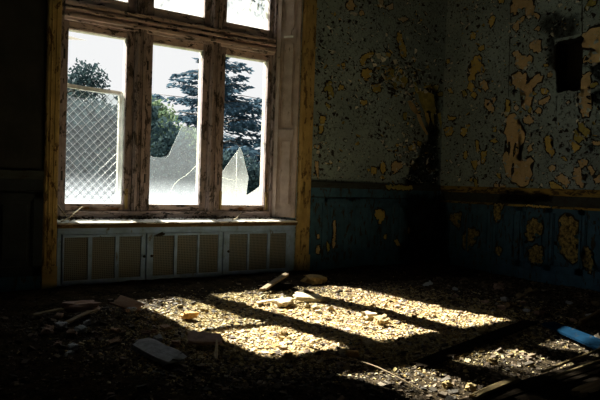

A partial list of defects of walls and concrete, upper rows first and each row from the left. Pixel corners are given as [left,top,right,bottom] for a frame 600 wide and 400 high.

spalling [490,0,600,189]
peeling [554,212,597,275]